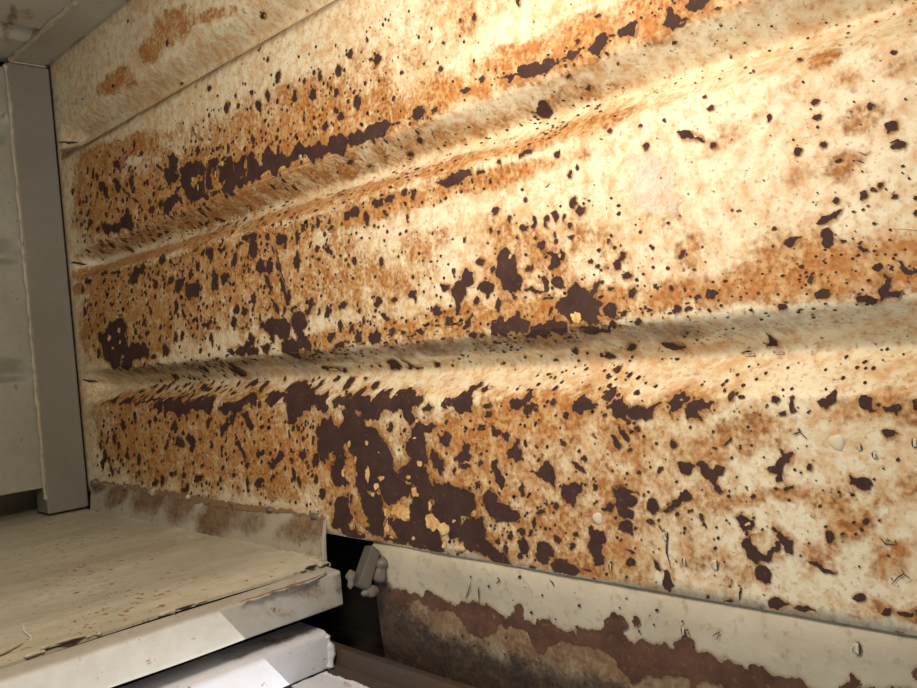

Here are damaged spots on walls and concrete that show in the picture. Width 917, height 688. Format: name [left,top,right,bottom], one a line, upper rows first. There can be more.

peeling [860,120,907,149]
corrosion [61,0,917,374]
peeling [71,0,848,584]
peeling [731,181,917,321]
peeling [858,395,902,416]
water stain [99,480,325,520]
corrosion [92,381,414,546]
corrosion [423,384,781,588]
corrosion [677,473,917,569]
peeling [822,475,875,497]
corrosion [390,588,808,688]
peeling [758,597,816,612]